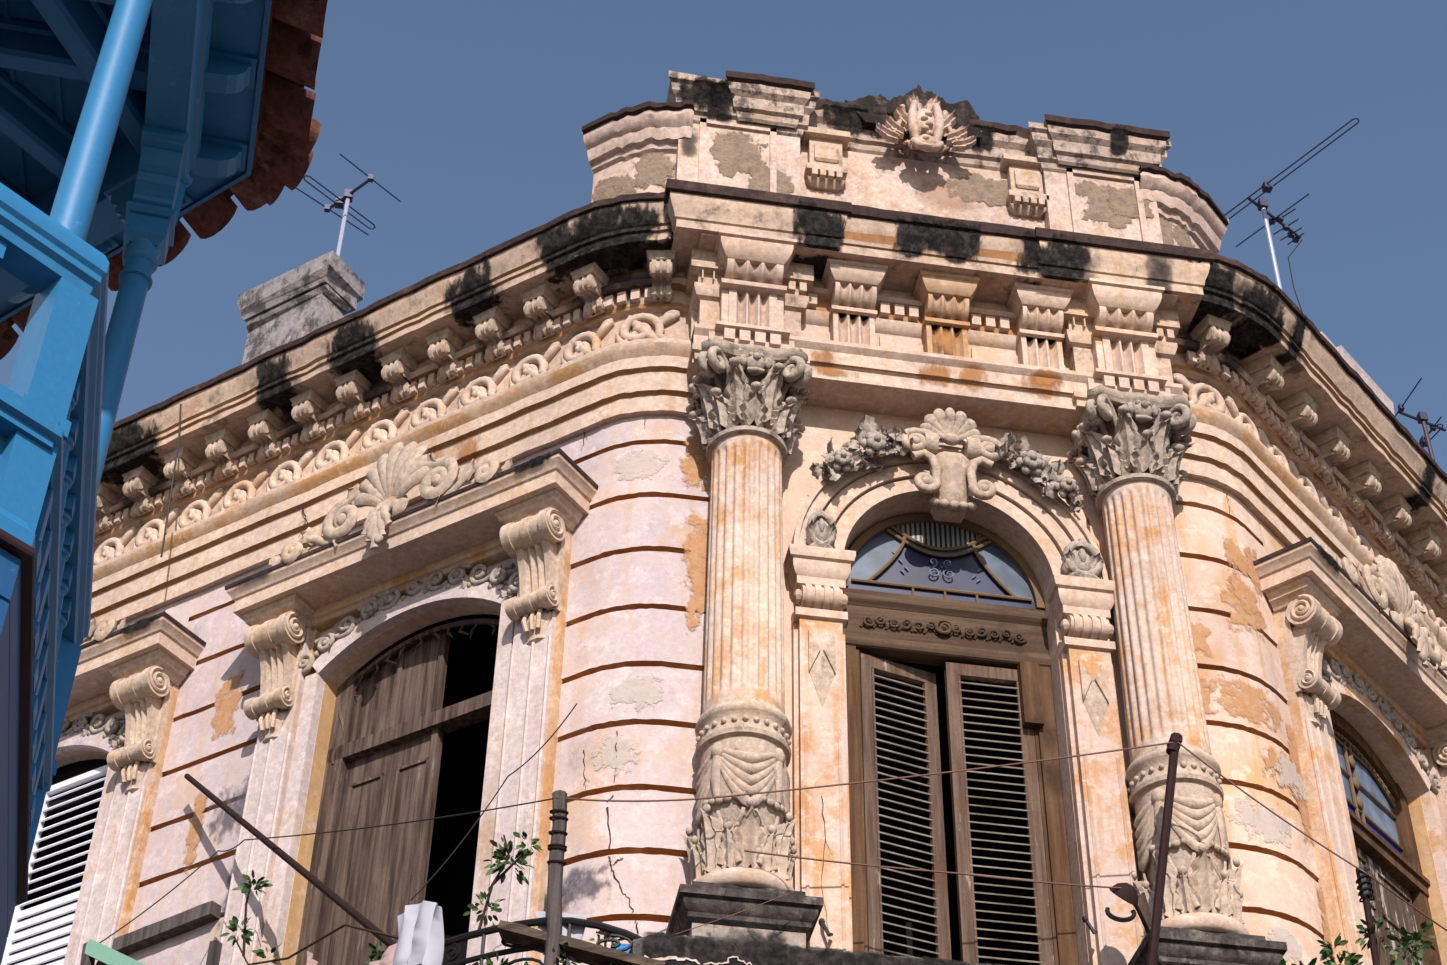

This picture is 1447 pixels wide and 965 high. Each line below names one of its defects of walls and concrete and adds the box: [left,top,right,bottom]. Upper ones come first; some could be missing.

flaking render [709,131,795,194]
water stain [444,255,503,347]
water stain [535,201,674,311]
water stain [893,215,982,263]
water stain [1016,230,1091,285]
flaking render [1074,180,1196,248]
water stain [1182,259,1309,372]
water stain [100,420,170,511]
peeling [1220,536,1266,642]
peeling [1199,674,1314,848]
crack [583,731,752,965]
peeling [1268,926,1304,963]